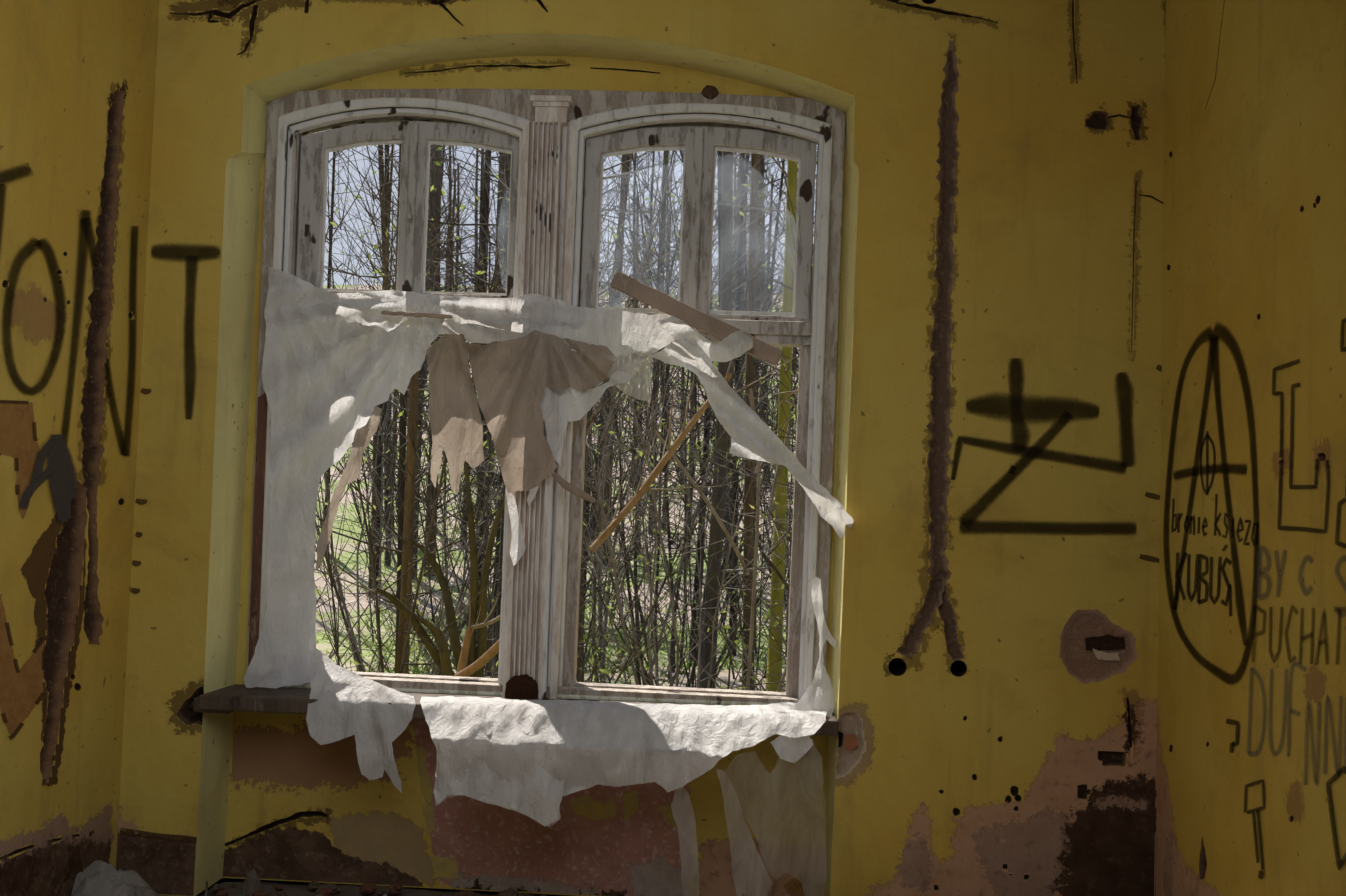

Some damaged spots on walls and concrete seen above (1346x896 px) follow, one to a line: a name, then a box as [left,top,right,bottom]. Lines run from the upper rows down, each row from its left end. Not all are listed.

crack [167,0,312,58]
crack [417,0,466,26]
crack [404,64,660,74]
crack [886,0,998,23]
crack [1071,0,1079,84]
spalling [1059,609,1137,684]
spalling [835,702,876,788]
peeling [229,717,692,896]
peeling [867,697,1219,896]
peeling [698,832,745,896]
peeling [752,838,824,896]